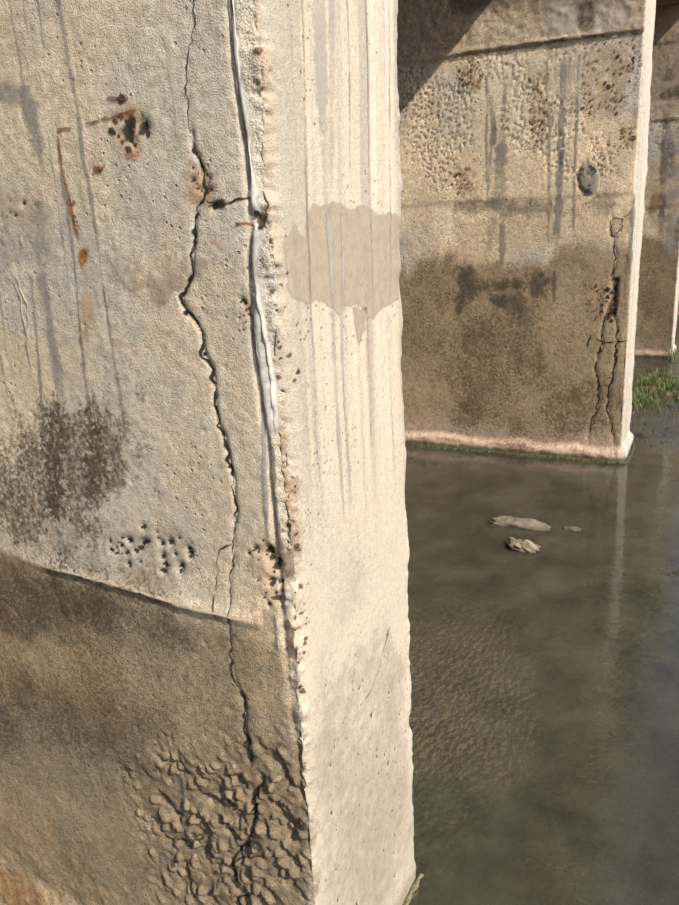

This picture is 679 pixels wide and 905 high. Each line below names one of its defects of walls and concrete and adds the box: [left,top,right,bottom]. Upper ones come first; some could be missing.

damp [0,84,42,151]
rust [57,127,79,236]
damp [76,103,96,231]
rust [87,93,150,157]
damp [548,97,598,192]
rust [79,248,88,265]
damp [284,163,401,344]
damp [457,267,556,313]
crack [610,214,629,276]
damp [0,319,129,552]
crack [61,0,265,905]
crack [587,317,627,447]